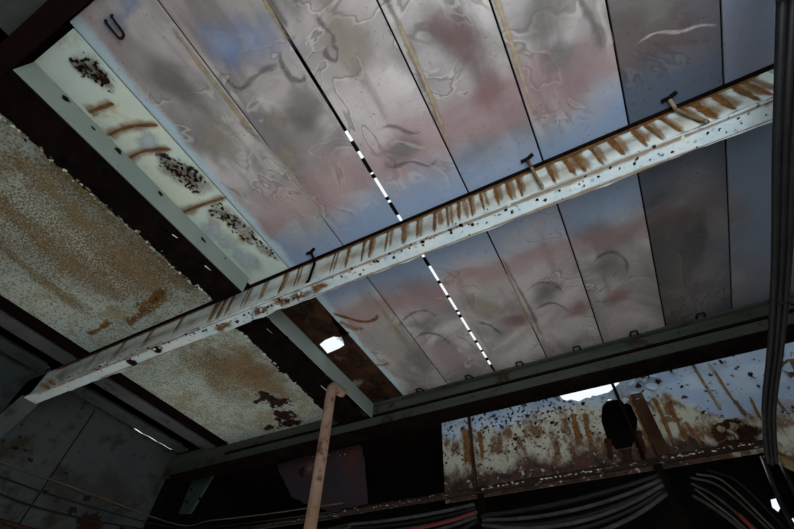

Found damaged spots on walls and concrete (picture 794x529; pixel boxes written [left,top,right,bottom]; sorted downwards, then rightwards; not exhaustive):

leakage [494,0,530,103]
rust [0,148,194,326]
rust [39,75,773,399]
rust [247,391,302,430]
rust [462,429,484,463]
rust [569,413,593,445]
rust [652,398,701,445]
rust [707,363,762,449]